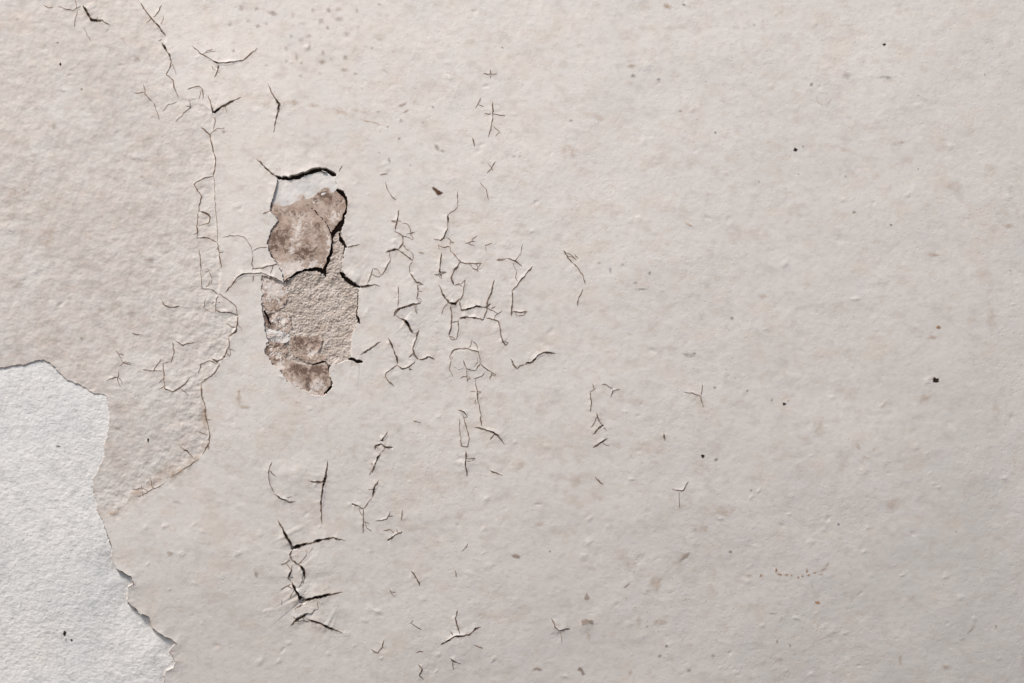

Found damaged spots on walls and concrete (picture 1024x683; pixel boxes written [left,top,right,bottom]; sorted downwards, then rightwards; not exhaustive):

crack [107,333,194,395]
crack [137,2,278,316]
peeling [175,317,242,475]
spalling [257,159,380,396]
crack [367,69,556,476]
peeling [0,360,177,683]
crack [268,433,403,633]